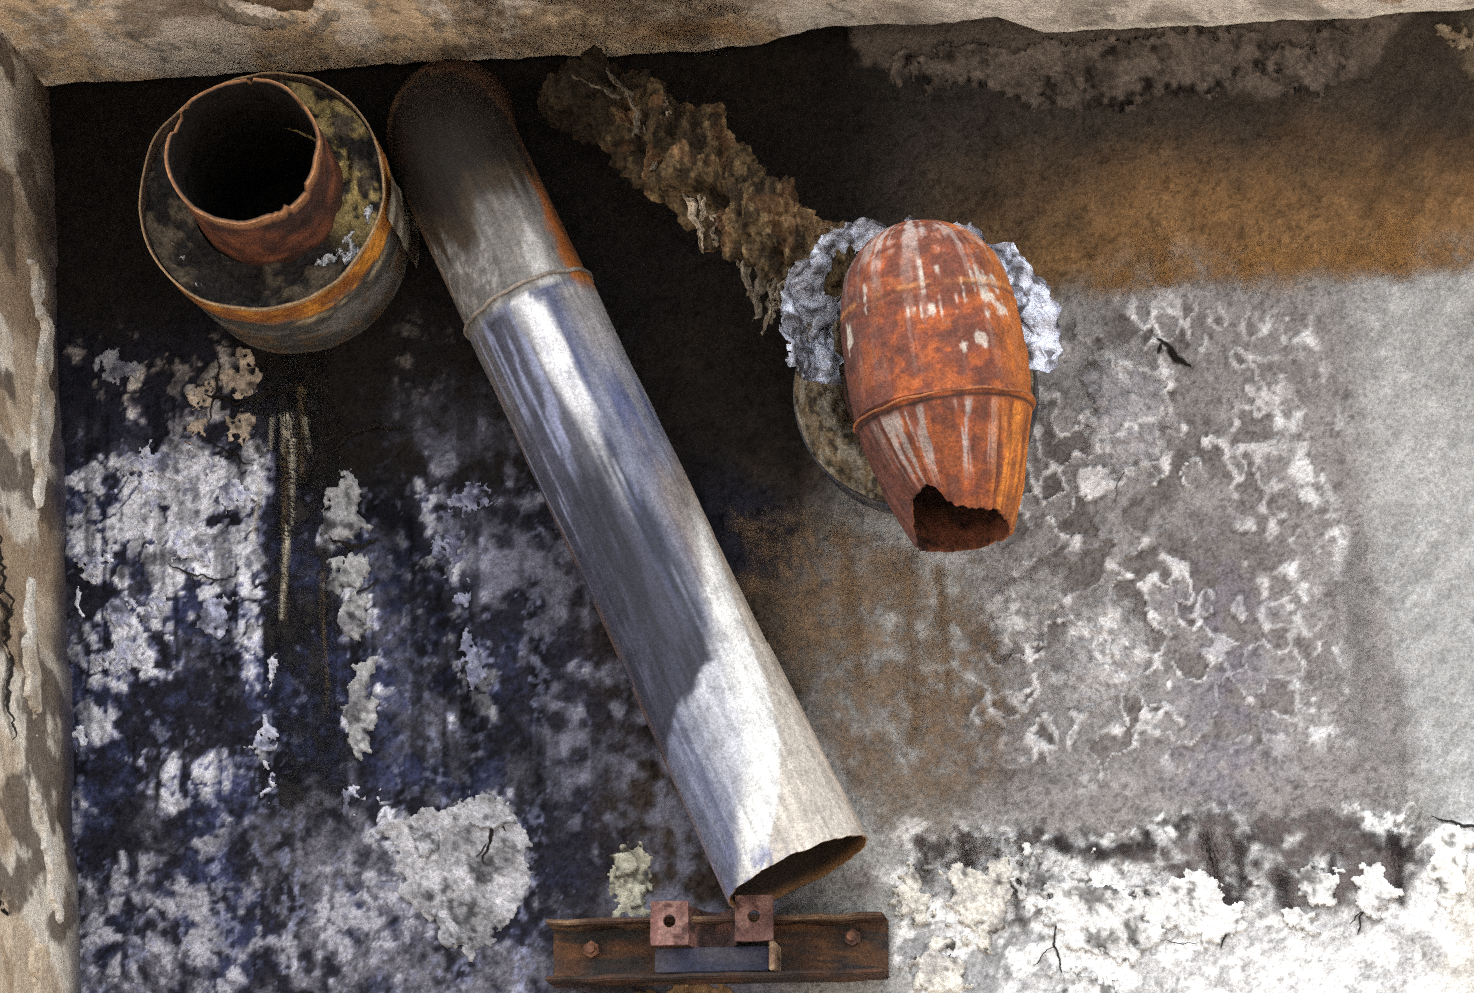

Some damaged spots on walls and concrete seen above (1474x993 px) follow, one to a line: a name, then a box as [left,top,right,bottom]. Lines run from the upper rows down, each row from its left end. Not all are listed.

spalling [203,0,341,32]
leakage [251,351,349,809]
crack [0,534,17,740]
crack [0,891,10,917]
flaking render [1425,825,1474,914]